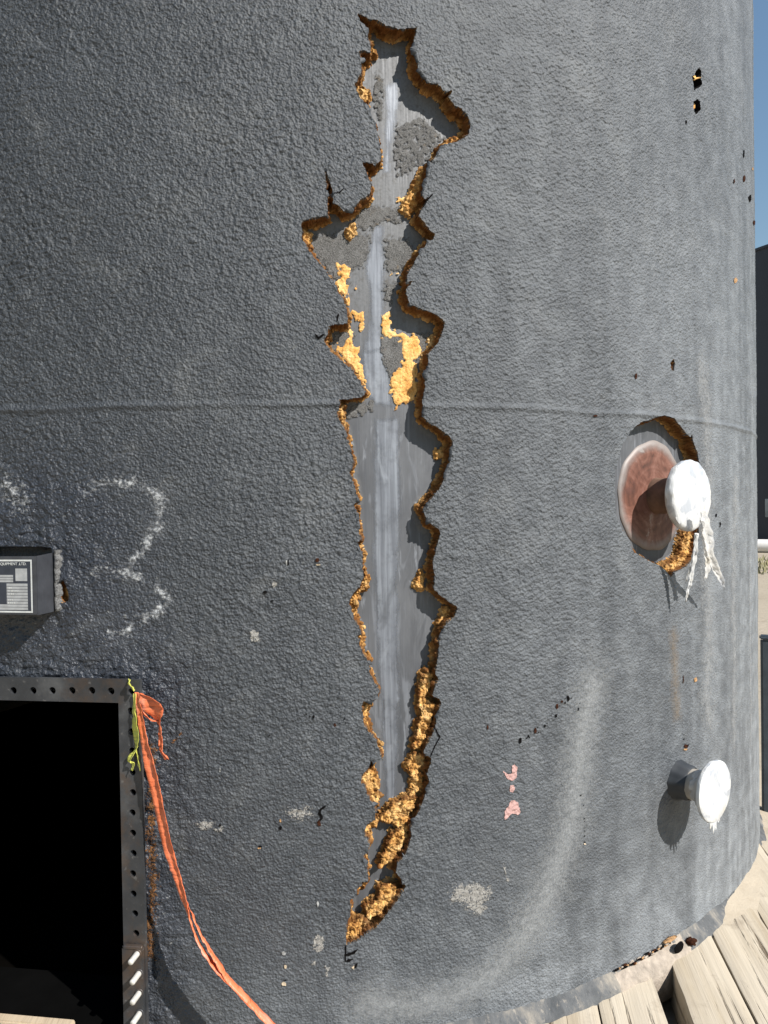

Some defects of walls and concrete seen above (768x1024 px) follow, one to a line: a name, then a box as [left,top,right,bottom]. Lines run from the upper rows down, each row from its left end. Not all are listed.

spalling [692,68,702,114]
spalling [307,34,460,912]
spalling [615,415,700,577]